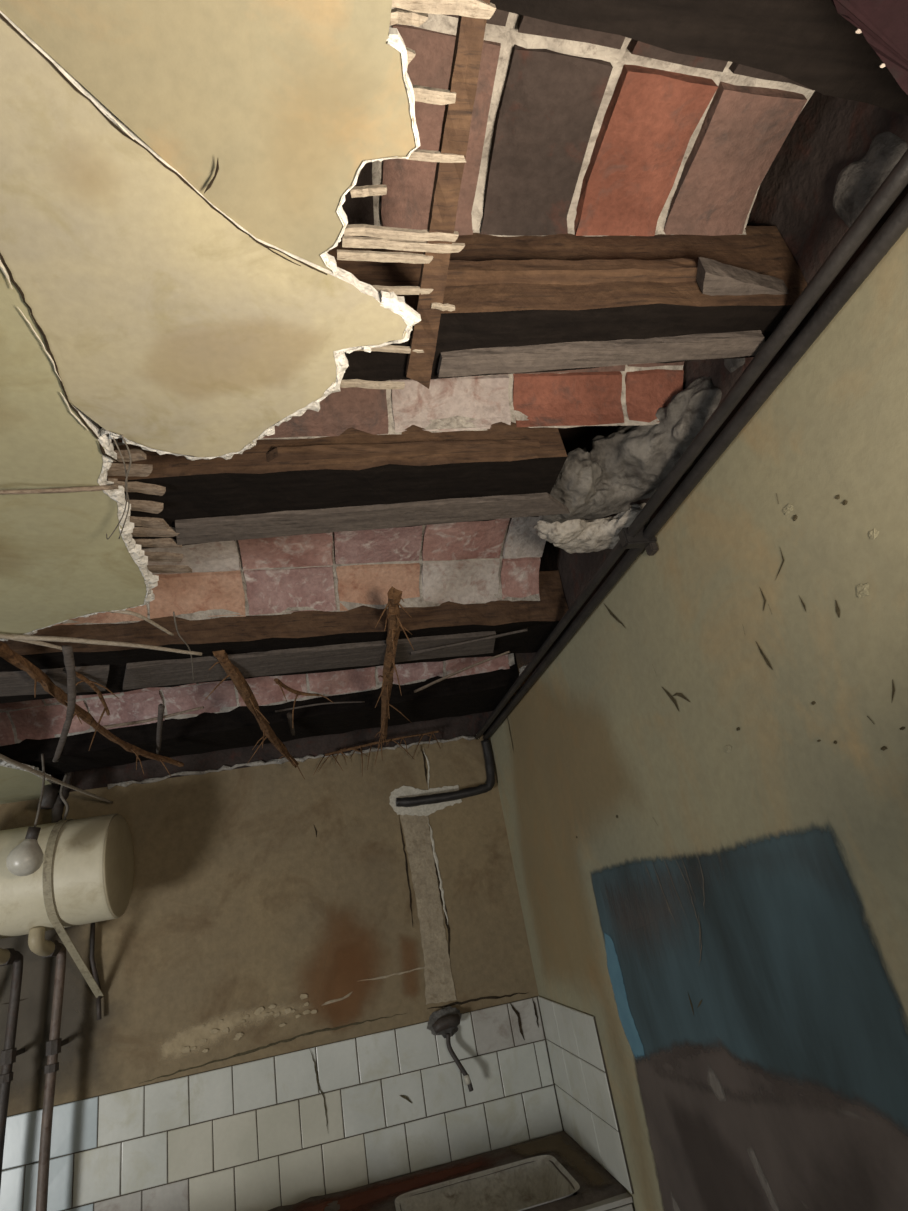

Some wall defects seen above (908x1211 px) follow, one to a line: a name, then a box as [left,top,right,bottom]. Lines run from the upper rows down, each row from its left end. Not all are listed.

crack [0,13,327,275]
flaking render [320,27,420,275]
crack [0,253,120,463]
flaking render [22,291,421,635]
flaking render [0,759,51,780]
flaking render [108,736,475,789]
crack [421,749,430,789]
flaking render [161,994,317,1057]
crack [309,1048,328,1130]
rust [312,928,374,1022]
crack [321,818,450,1006]
flaking render [635,1042,908,1211]